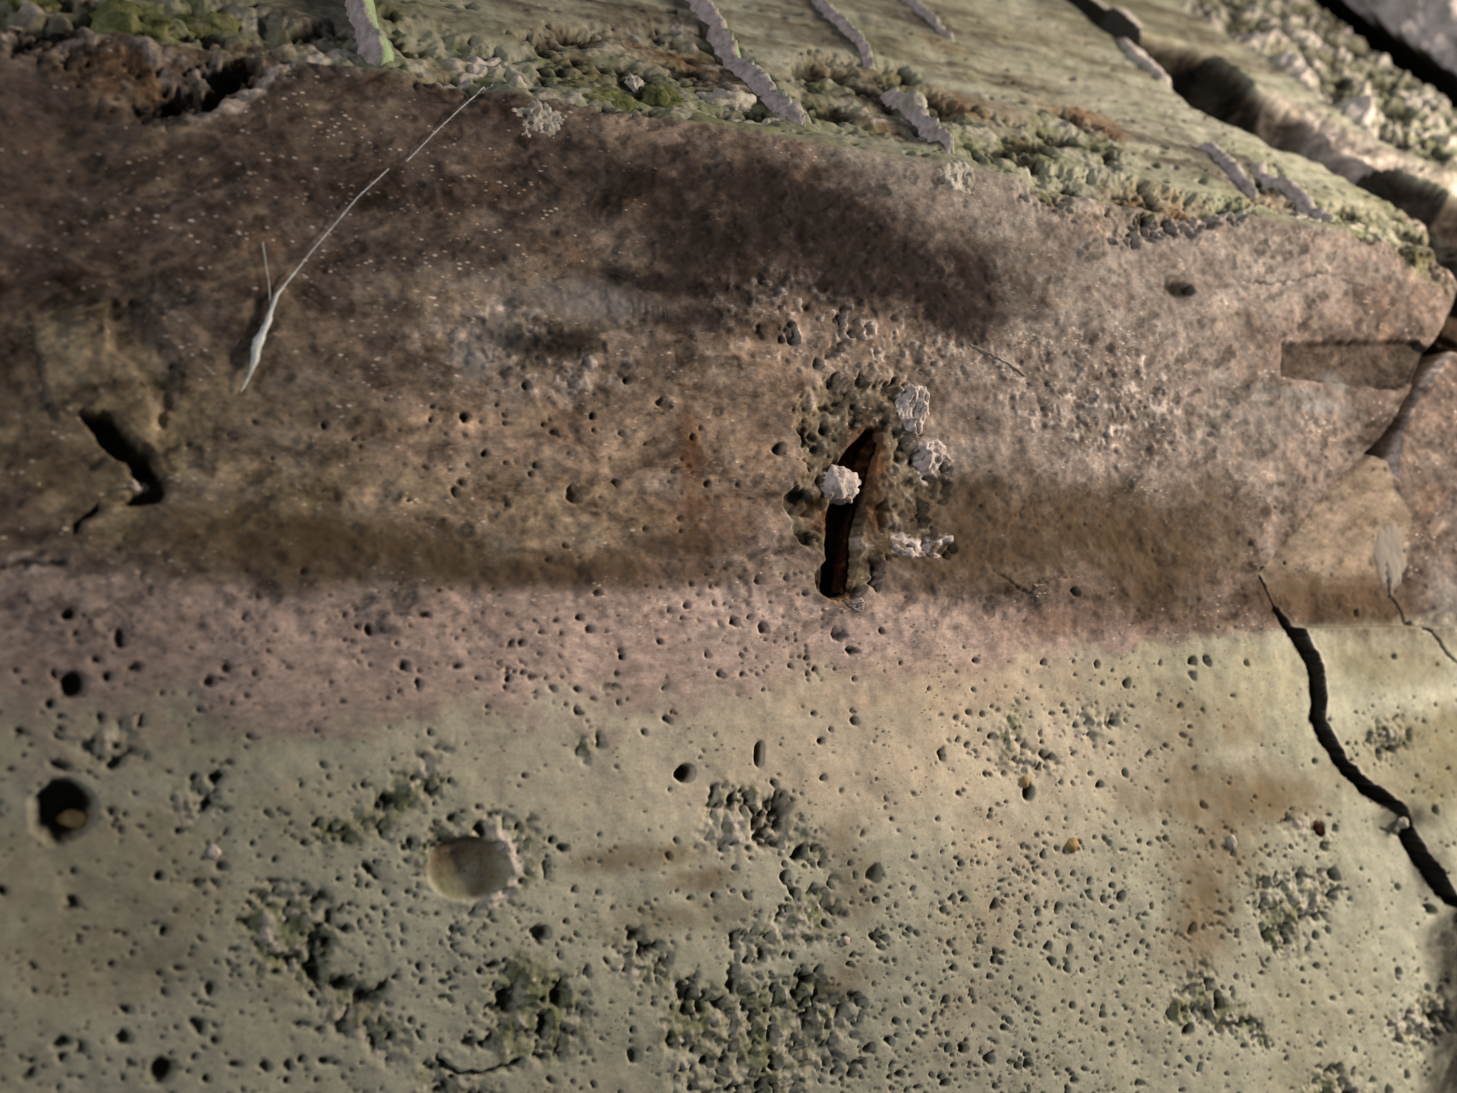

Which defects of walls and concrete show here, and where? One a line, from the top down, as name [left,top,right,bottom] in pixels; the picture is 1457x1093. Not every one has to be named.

crack [1067,0,1457,247]
peeling [32,299,186,533]
corrosion [839,446,886,534]
spalling [783,371,953,606]
water stain [885,384,1224,597]
crack [1335,347,1457,482]
crack [1259,568,1457,907]